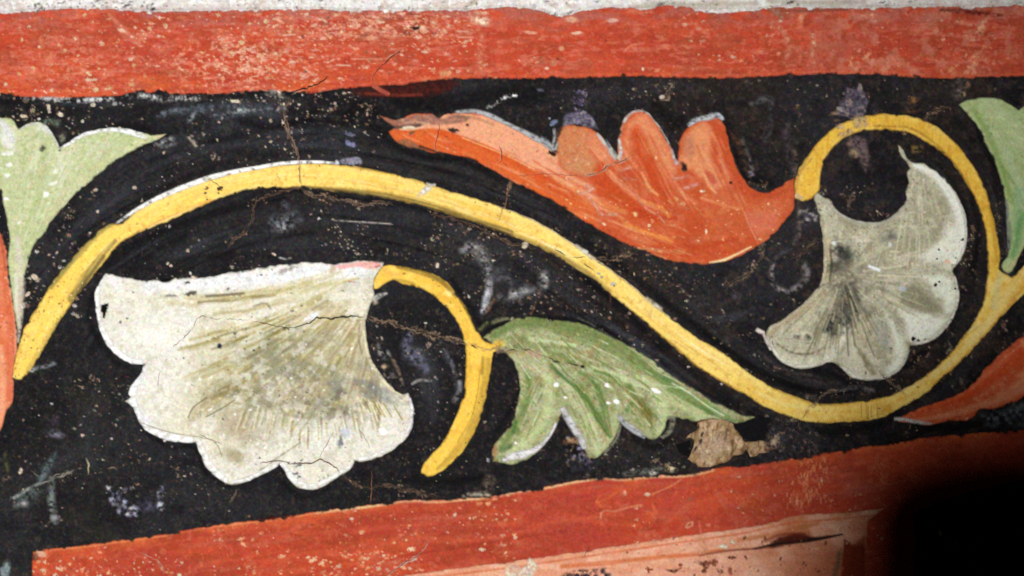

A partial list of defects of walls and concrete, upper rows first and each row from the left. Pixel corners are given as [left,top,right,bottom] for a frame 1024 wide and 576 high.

crack [284,76,328,176]
crack [173,315,577,366]
crack [263,438,338,470]
flaking render [676,418,818,467]